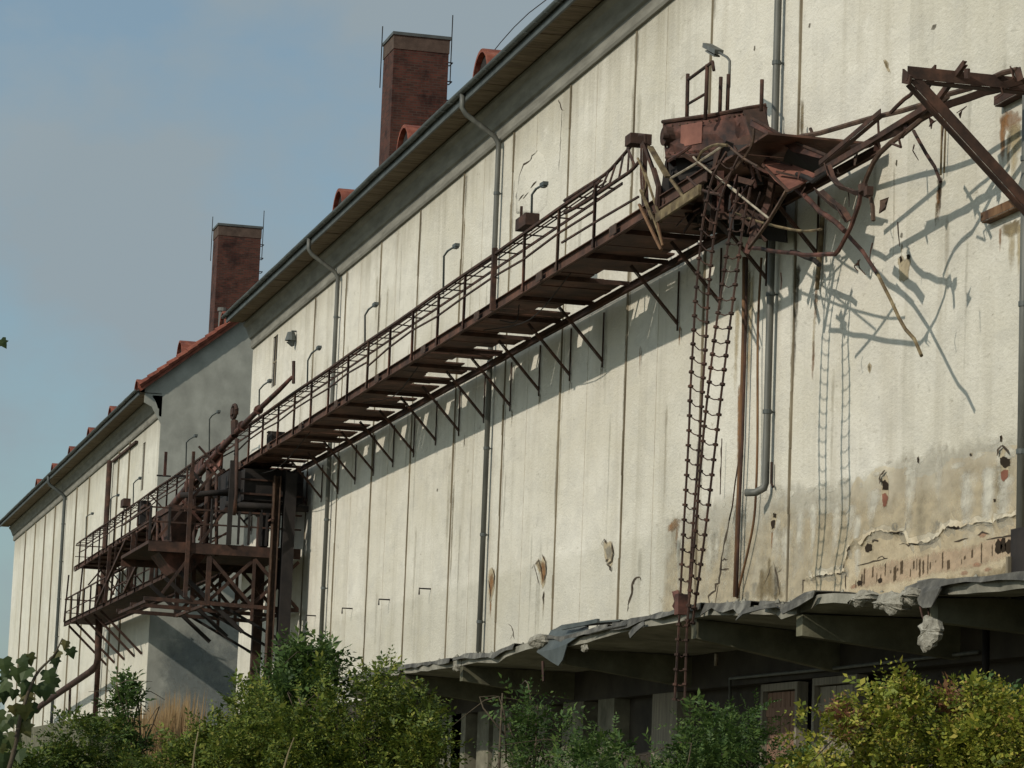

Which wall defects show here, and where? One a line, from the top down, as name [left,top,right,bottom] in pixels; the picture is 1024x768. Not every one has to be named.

corrosion [1000,112,1020,167]
corrosion [999,220,1020,261]
flaking render [665,435,1017,612]
peeling [601,539,614,571]
crack [627,577,641,611]
damp [746,560,780,598]